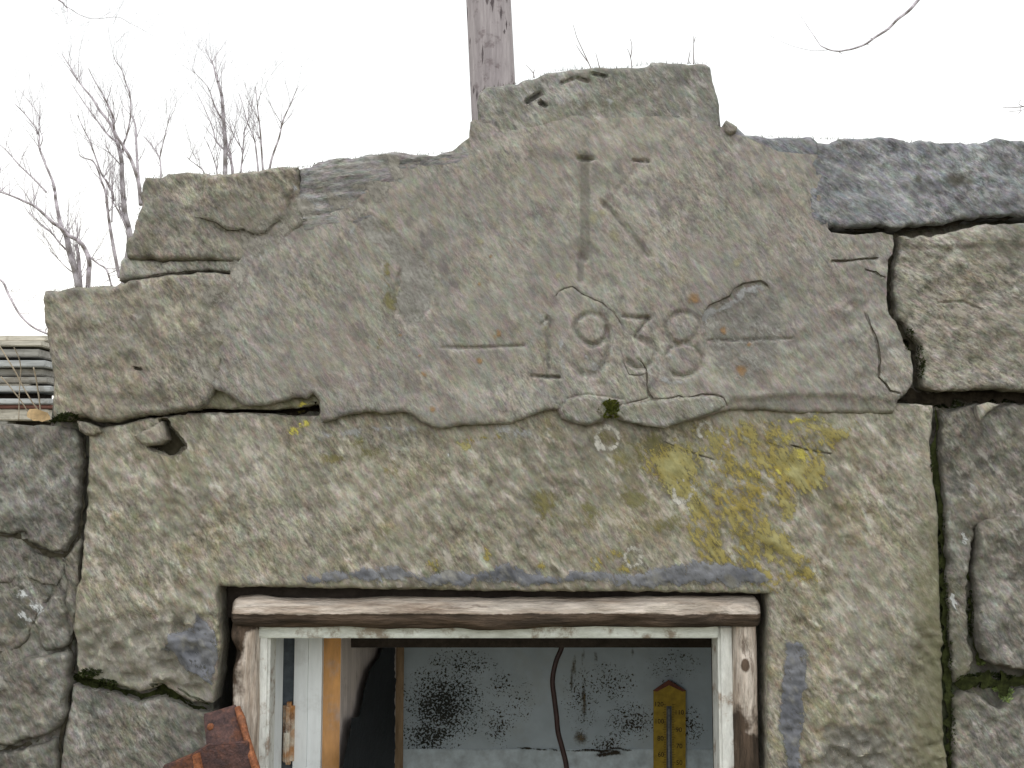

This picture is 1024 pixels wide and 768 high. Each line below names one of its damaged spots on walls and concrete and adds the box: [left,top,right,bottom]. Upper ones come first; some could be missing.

crack [195,217,279,235]
crack [556,286,621,323]
crack [706,280,770,310]
crack [618,360,727,408]
spalling [134,420,185,456]
crack [833,216,1024,768]
leakage [403,650,535,749]
leakage [520,657,653,757]